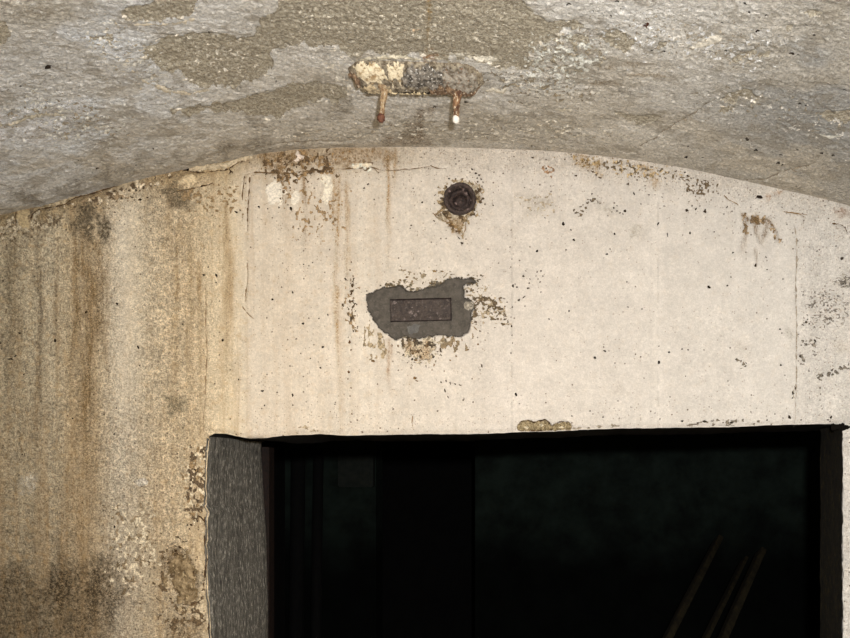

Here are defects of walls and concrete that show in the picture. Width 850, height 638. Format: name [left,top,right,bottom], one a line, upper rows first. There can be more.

rust [331,126,422,203]
damp [69,201,111,240]
peeling [342,261,513,366]
spalling [178,443,207,533]
damp [0,563,122,638]